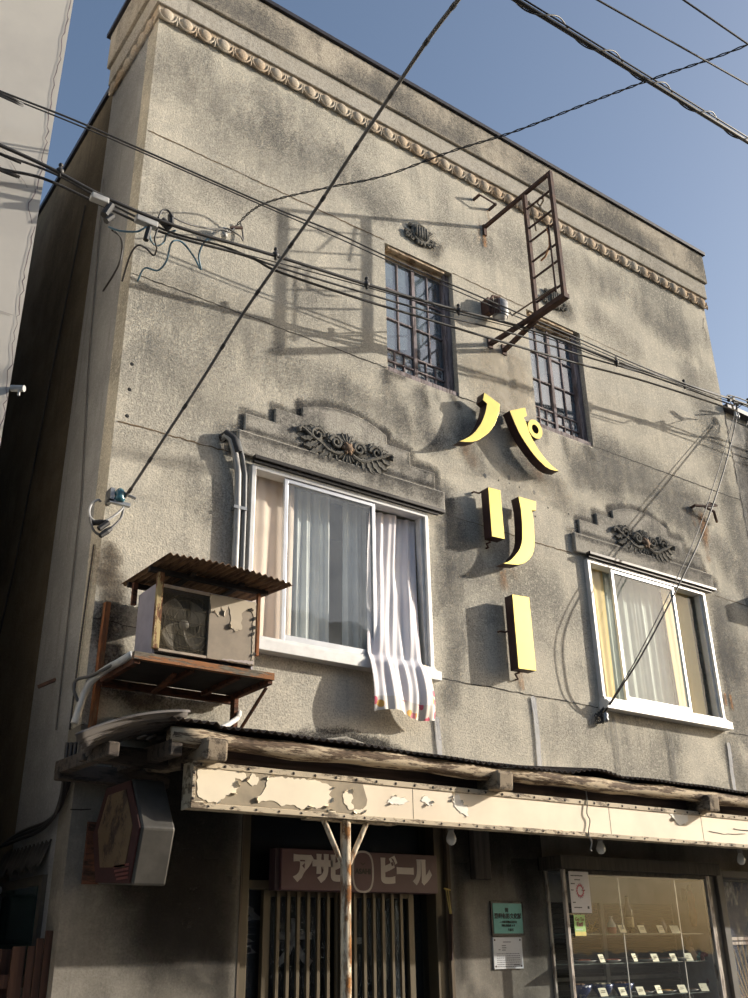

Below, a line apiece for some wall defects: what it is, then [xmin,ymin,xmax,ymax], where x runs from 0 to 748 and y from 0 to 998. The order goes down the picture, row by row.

damp [93,542,126,664]
damp [571,429,748,729]
damp [107,679,164,712]
peeling [194,767,367,815]
damp [299,729,400,750]
damp [120,770,239,974]